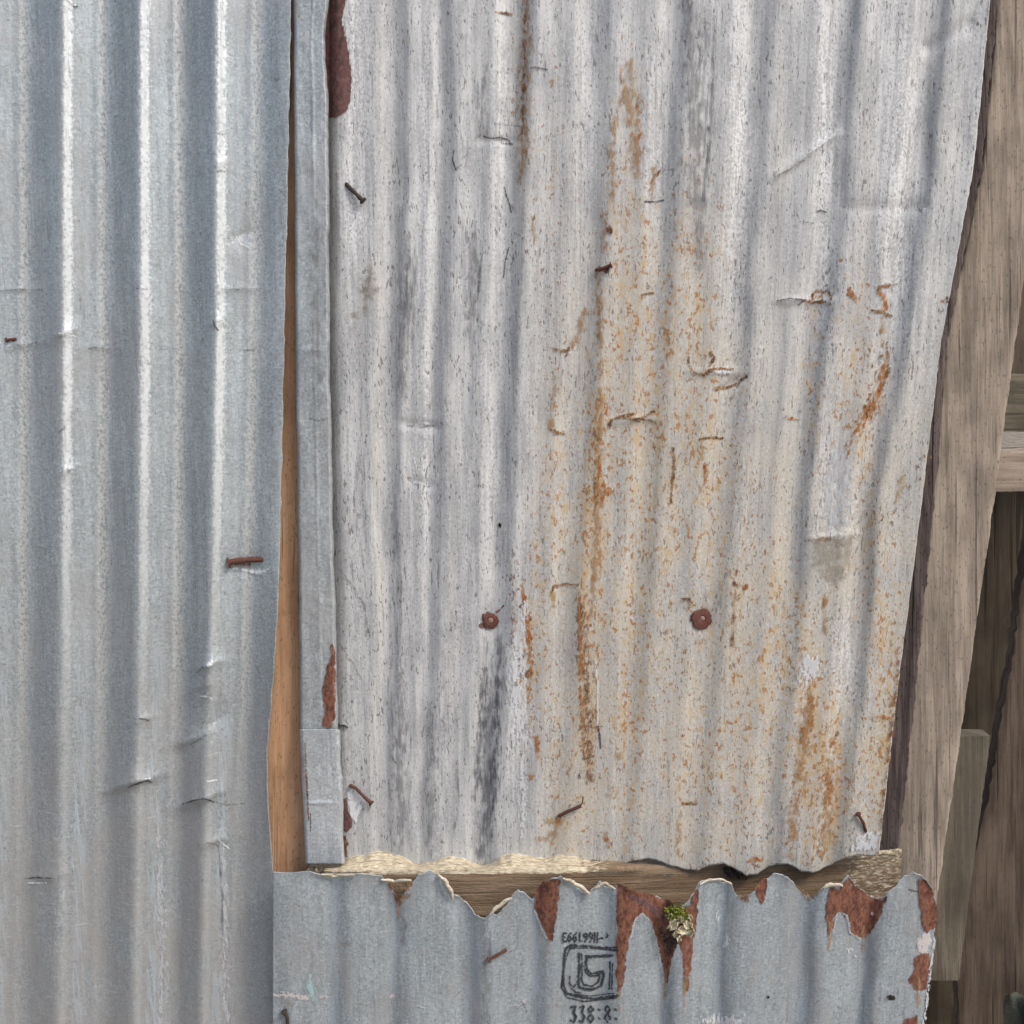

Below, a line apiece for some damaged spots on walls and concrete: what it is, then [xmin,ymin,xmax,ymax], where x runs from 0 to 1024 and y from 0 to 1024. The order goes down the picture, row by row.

corrosion [325,0,352,118]
corrosion [607,59,642,197]
corrosion [844,283,897,459]
corrosion [550,361,614,785]
corrosion [322,644,336,728]
corrosion [786,686,816,857]
corrosion [817,759,835,858]
corrosion [534,879,561,953]
corrosion [616,883,700,1010]
corrosion [802,877,887,951]
corrosion [903,953,931,1024]
corrosion [908,879,938,934]